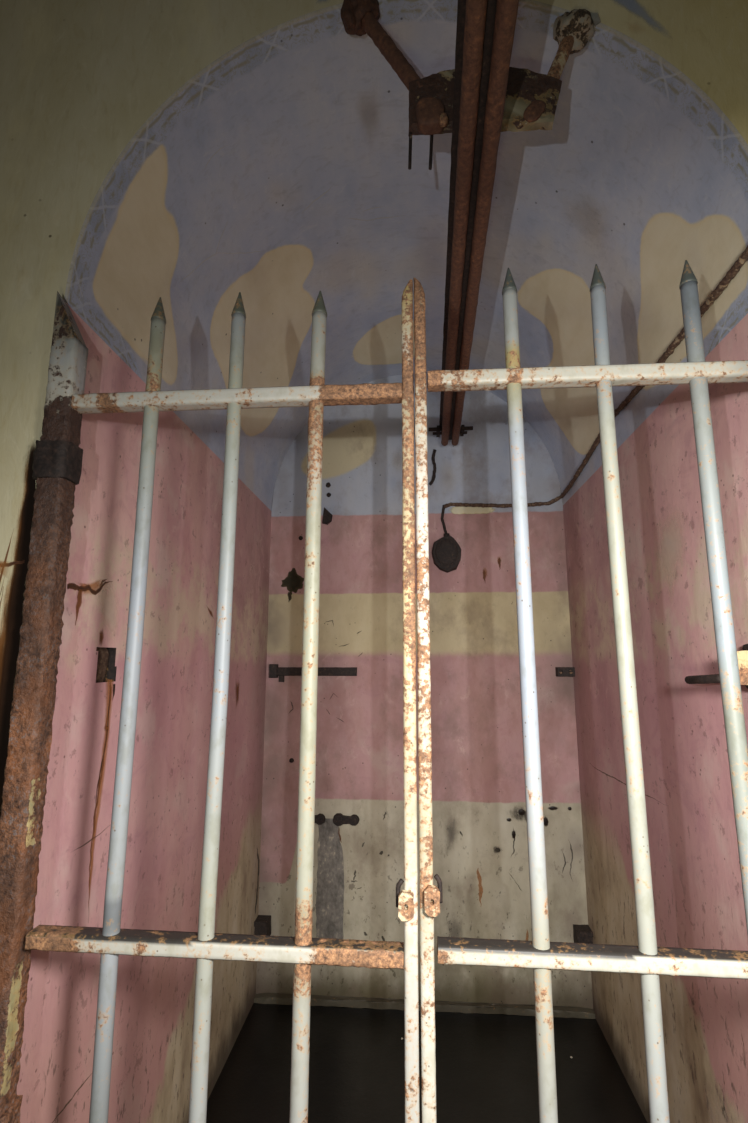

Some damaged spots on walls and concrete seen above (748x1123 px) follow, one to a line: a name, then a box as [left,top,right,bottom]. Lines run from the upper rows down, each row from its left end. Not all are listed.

rust [0,447,36,818]
rust [88,679,115,919]